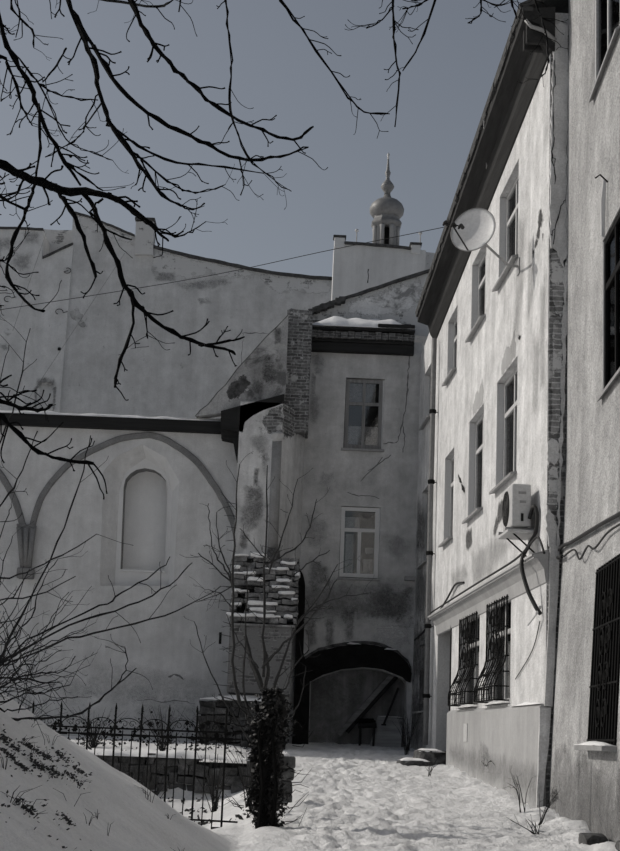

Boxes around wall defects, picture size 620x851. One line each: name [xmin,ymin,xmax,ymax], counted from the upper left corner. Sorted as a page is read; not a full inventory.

crack [551,60,568,244]
flaking render [151,249,424,317]
flaking render [549,249,564,435]
flaking render [259,404,297,440]
crack [347,356,410,499]
flaking render [547,466,559,510]